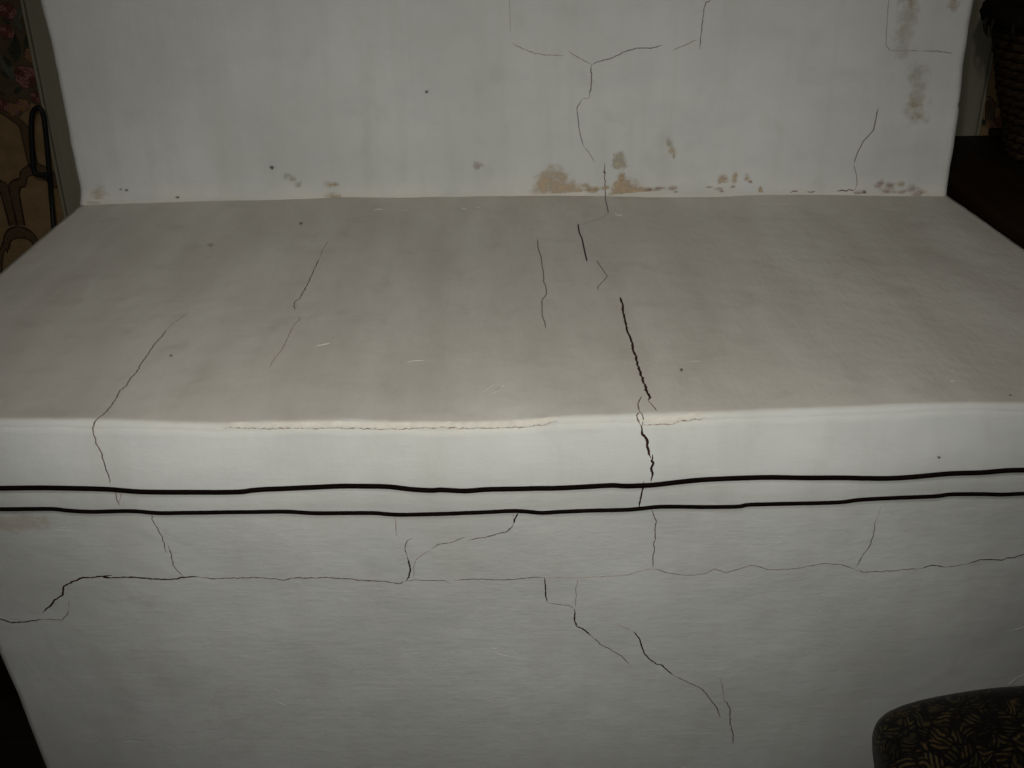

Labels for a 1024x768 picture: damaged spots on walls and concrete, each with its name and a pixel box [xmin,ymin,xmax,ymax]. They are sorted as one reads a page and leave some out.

crack [537,239,547,327]
crack [509,0,710,290]
crack [790,110,878,193]
crack [0,297,1024,742]